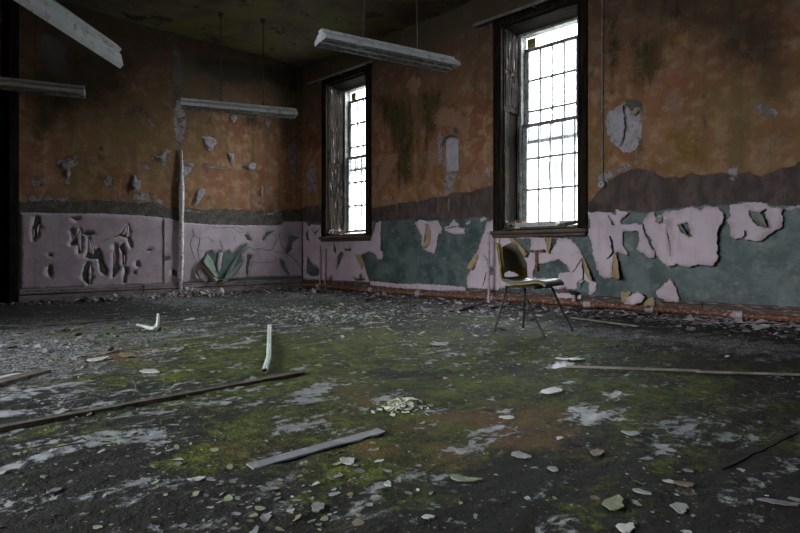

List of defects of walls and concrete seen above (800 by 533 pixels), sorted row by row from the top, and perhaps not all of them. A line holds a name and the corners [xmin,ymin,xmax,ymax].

water stain [382,101,412,181]
spalling [19,100,800,299]
crack [190,226,301,268]
peeling [620,279,679,307]